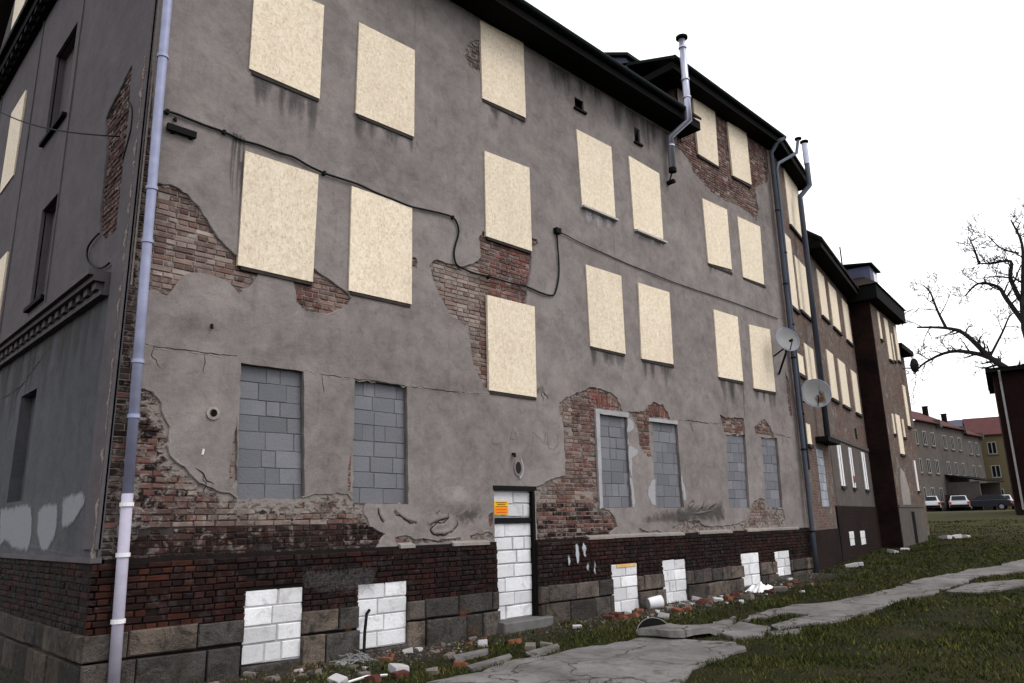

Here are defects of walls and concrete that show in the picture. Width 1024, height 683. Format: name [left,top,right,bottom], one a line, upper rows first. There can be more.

flaking render [463,39,480,72]
flaking render [676,114,768,222]
crack [144,344,238,374]
flaking render [90,56,494,560]
flaking render [412,230,538,391]
flaking render [535,387,670,540]
flaking render [638,498,786,533]
flaking render [720,414,774,439]